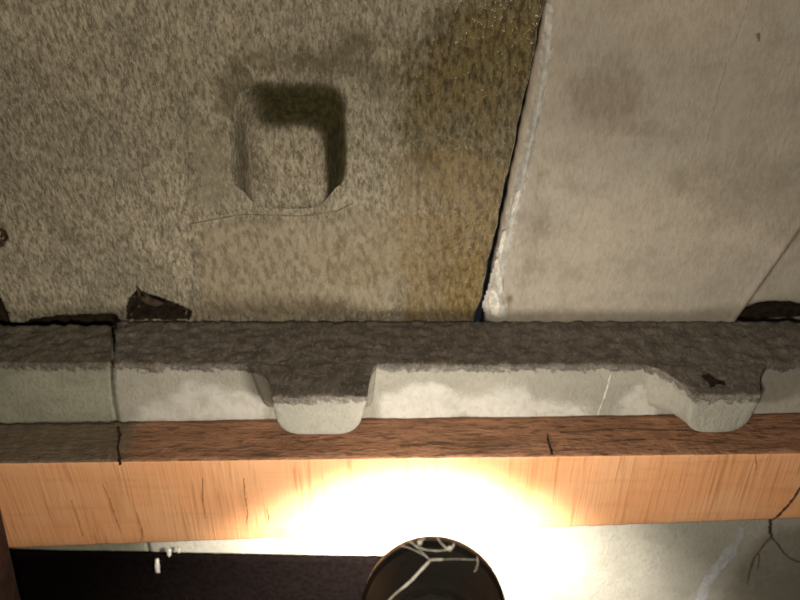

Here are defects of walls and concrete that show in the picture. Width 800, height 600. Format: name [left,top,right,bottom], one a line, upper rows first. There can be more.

damp [399,0,544,311]
spalling [0,284,192,343]
spalling [702,374,726,388]
crack [115,426,123,466]
crack [747,487,800,584]